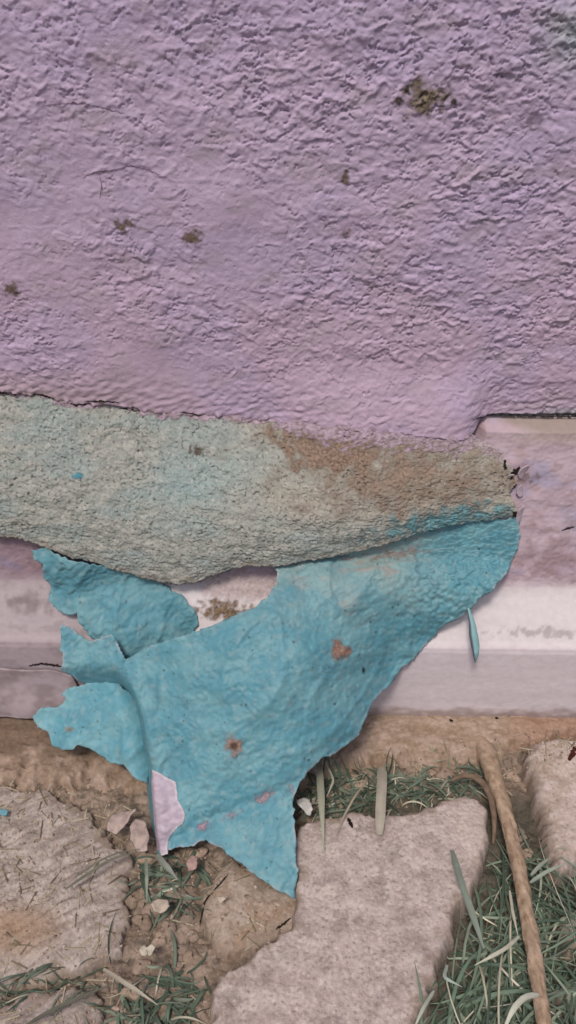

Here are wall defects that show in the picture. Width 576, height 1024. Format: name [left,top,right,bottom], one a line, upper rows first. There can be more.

crack [0,391,145,413]
peeling [0,393,521,898]